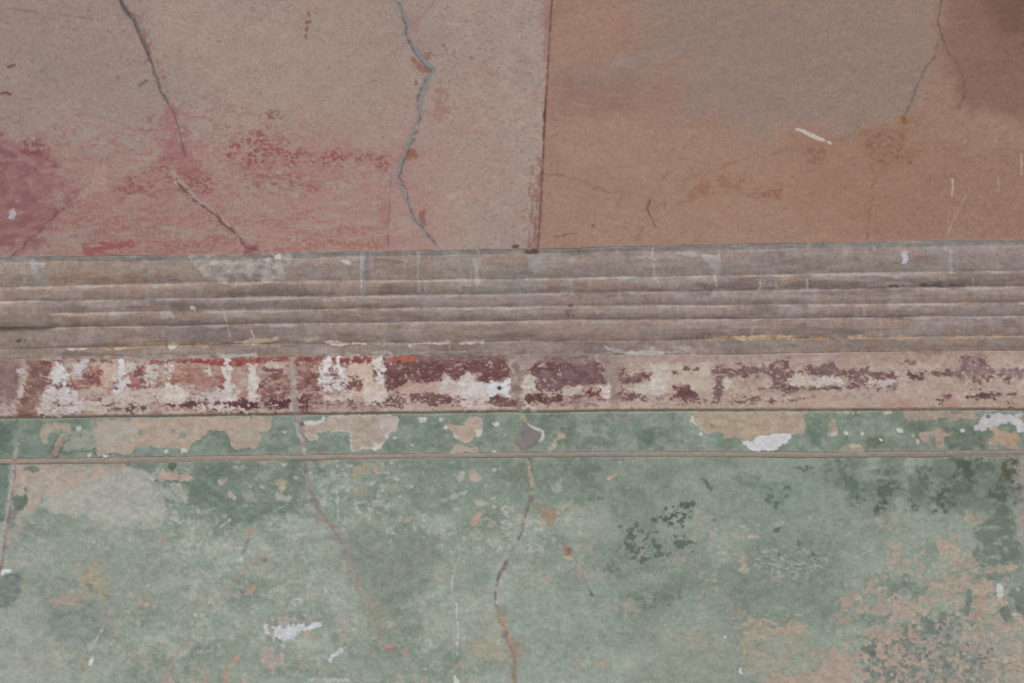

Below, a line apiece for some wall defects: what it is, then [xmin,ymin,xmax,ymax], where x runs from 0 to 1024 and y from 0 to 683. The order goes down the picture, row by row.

crack [118,0,259,252]
crack [385,0,439,251]
crack [903,0,967,117]
peeling [259,596,350,670]
peeling [0,333,1024,549]
crack [492,458,600,607]
peeling [706,496,1024,683]